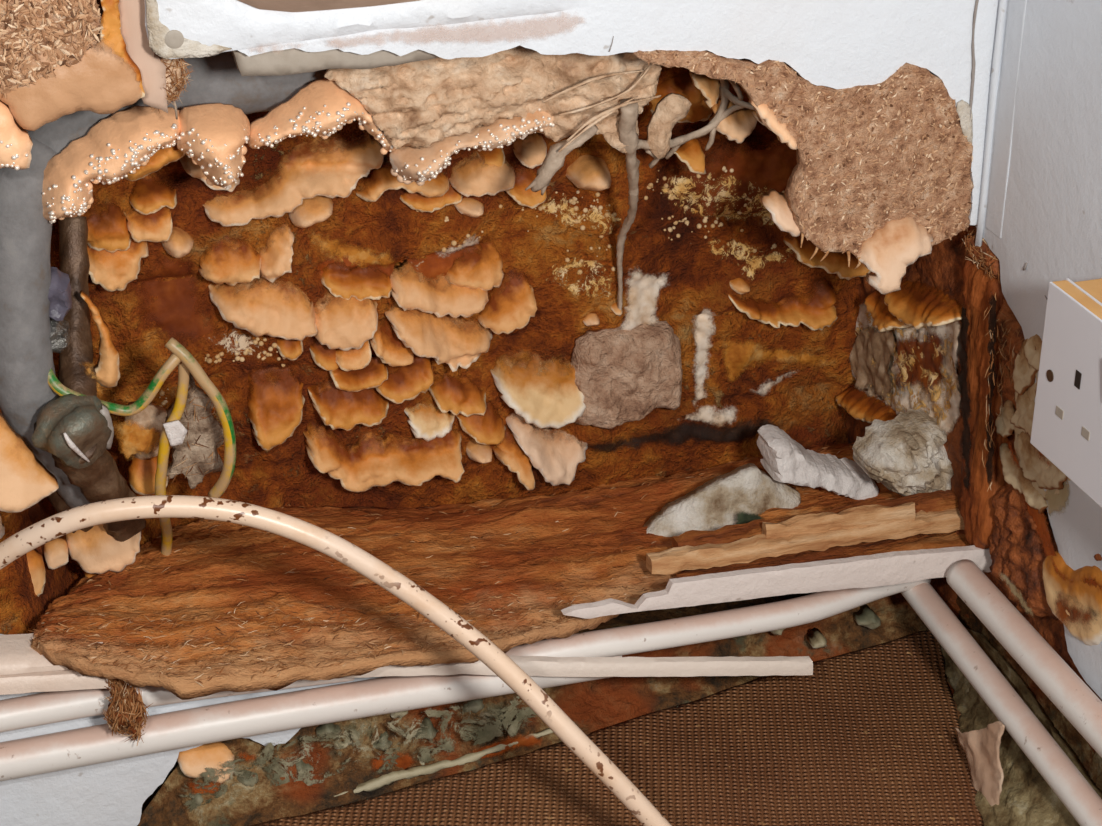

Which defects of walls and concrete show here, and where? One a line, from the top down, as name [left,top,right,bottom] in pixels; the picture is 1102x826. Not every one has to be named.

flaking render [571,320,683,429]
flaking render [849,327,895,398]
damp [1003,575,1032,613]